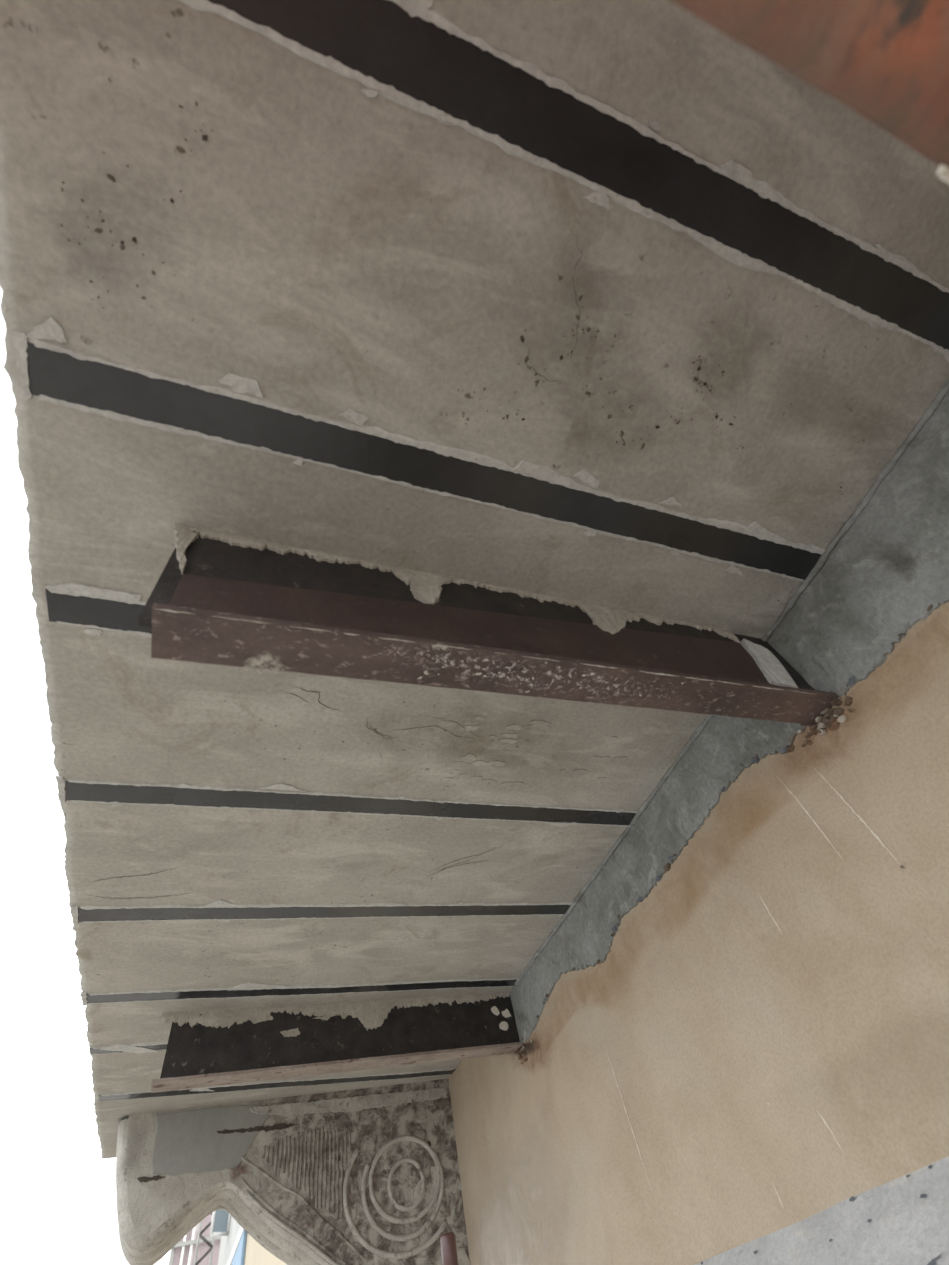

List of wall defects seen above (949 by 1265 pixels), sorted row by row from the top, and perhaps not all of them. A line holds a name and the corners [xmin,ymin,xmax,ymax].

peeling [719,160,757,187]
peeling [936,164,949,184]
spalling [60,199,144,256]
peeling [513,460,600,489]
peeling [173,524,199,575]
peeling [745,521,806,549]
peeling [393,566,455,605]
peeling [592,605,640,634]
spalling [382,638,857,754]
crack [285,687,477,742]
peeling [248,1013,300,1037]
peeling [491,1006,511,1031]